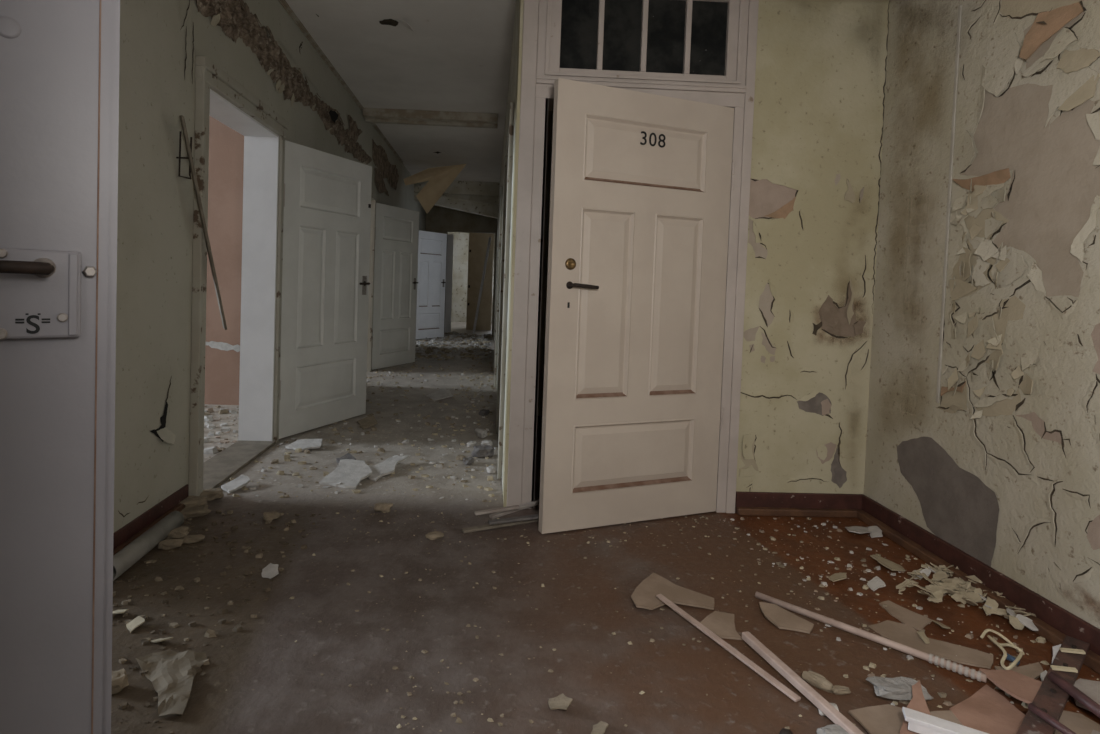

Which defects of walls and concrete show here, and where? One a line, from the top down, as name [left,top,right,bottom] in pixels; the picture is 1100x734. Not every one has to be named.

spalling [379,19,414,32]
flaking render [195,0,399,196]
peeling [748,173,802,259]
crack [798,210,806,230]
peeling [937,0,1100,457]
peeling [812,279,866,338]
crack [741,309,817,400]
crack [845,341,871,389]
flaking render [797,391,847,488]
crack [939,297,1100,589]